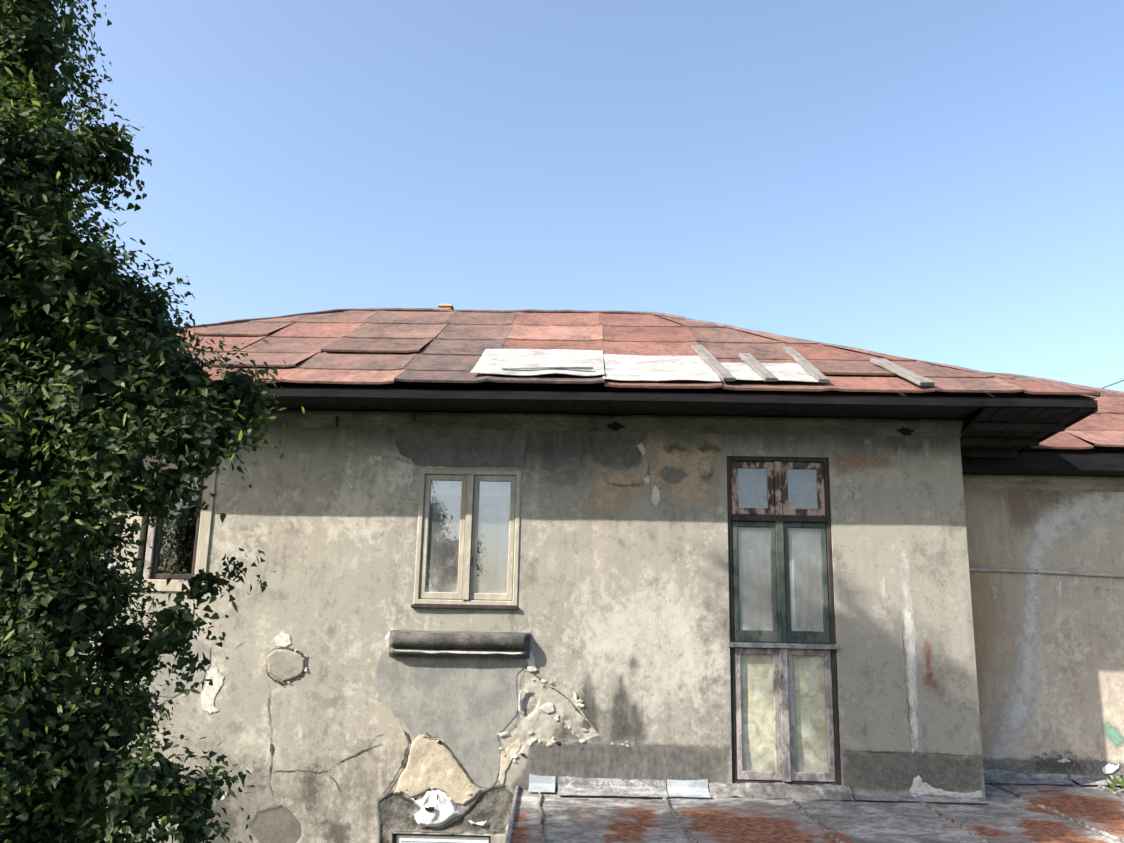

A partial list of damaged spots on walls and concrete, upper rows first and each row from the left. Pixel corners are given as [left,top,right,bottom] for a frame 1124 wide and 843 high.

peeling [589,438,721,518]
crack [267,686,410,803]
peeling [379,628,601,843]